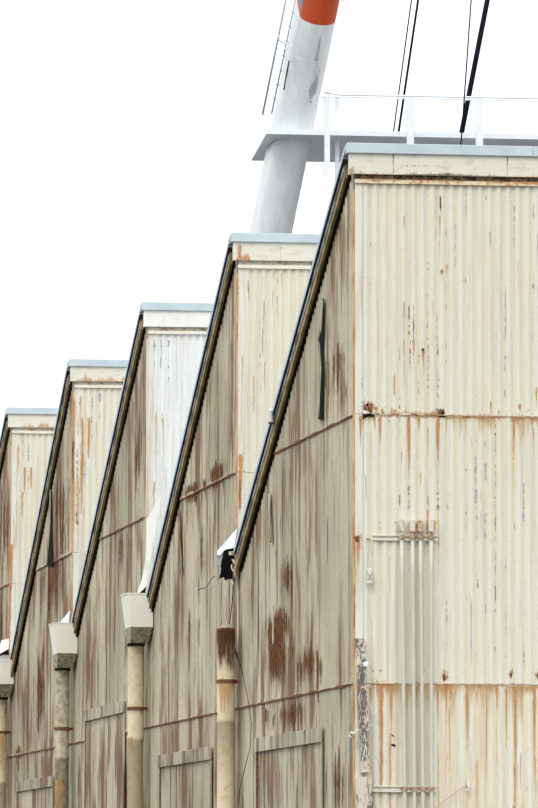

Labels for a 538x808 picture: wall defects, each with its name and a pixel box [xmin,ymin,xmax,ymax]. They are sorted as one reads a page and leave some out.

rust [0,492,13,640]
rust [33,400,97,620]
rust [143,683,231,729]
rust [217,627,236,668]
rust [235,605,353,732]
rust [369,670,538,808]